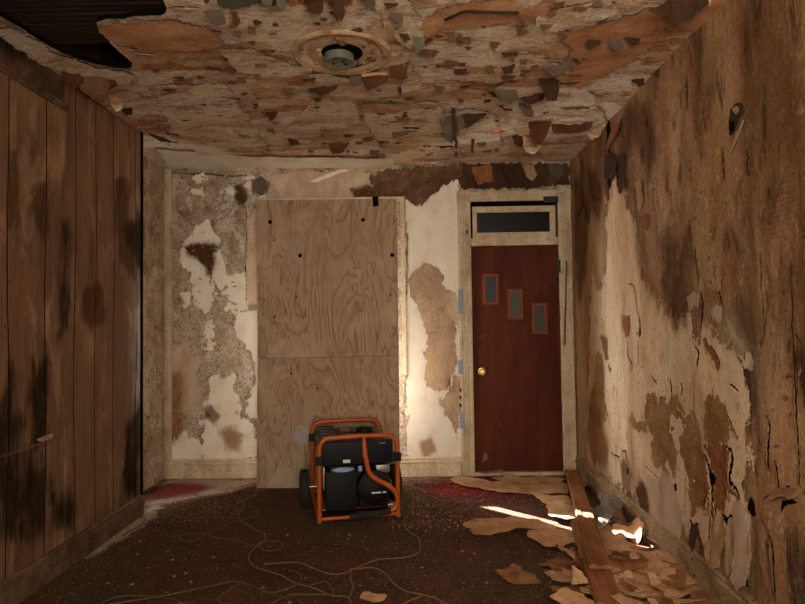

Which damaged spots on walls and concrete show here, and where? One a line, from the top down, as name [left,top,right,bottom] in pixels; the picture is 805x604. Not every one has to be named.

peeling [0,24,136,115]
peeling [147,0,646,199]
peeling [510,0,726,37]
water stain [0,359,74,547]
flaking render [172,215,258,459]
water stain [621,462,631,492]
water stain [636,221,692,327]
flaking render [585,177,758,545]
crack [762,290,805,490]
water stain [787,536,805,604]